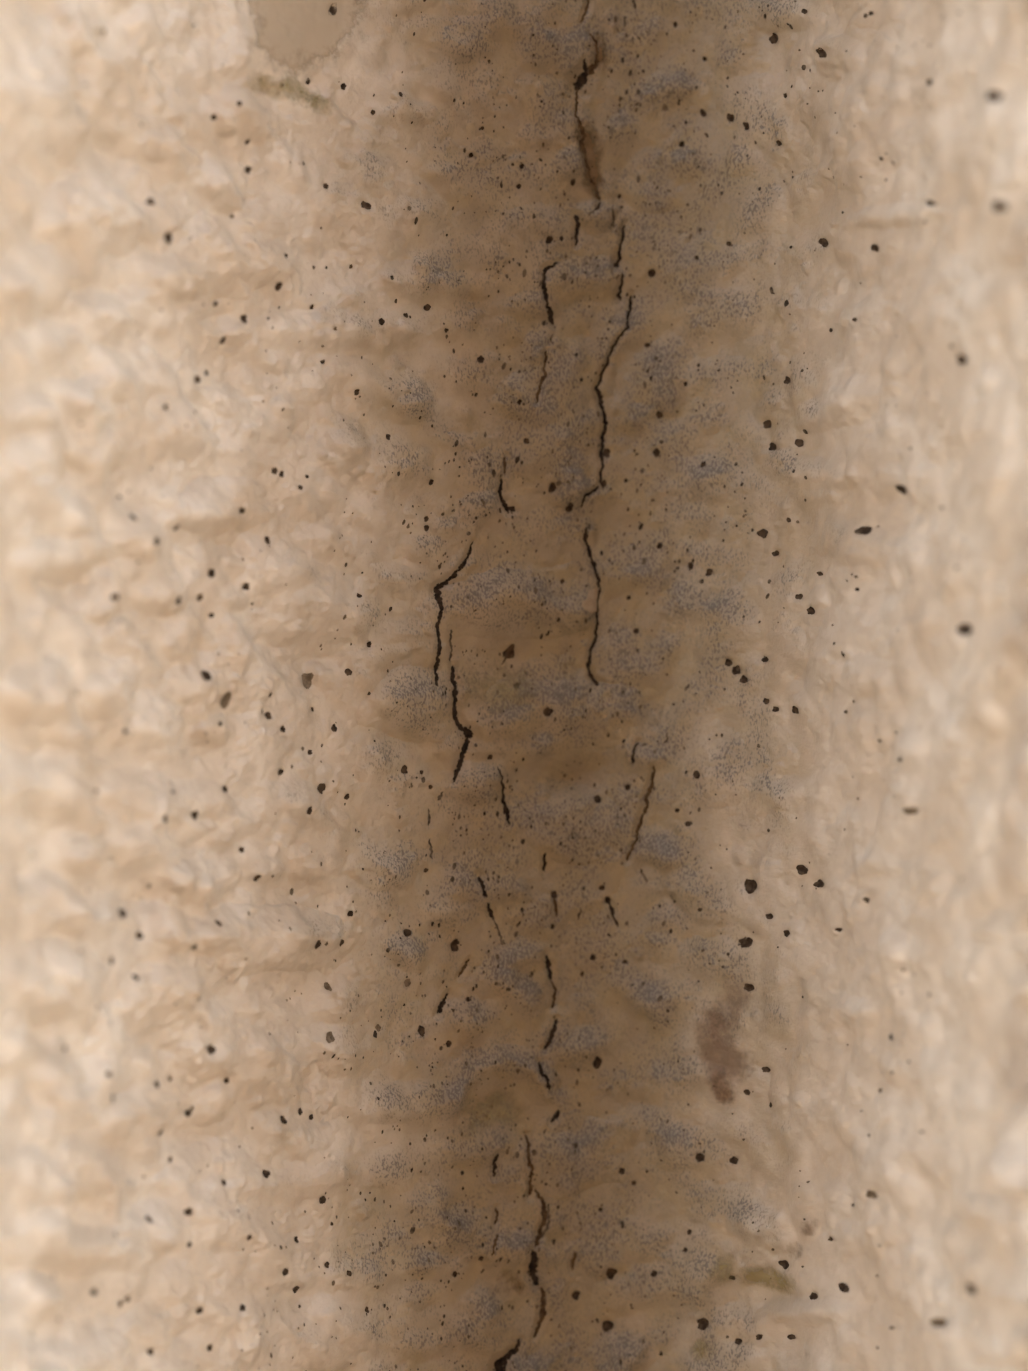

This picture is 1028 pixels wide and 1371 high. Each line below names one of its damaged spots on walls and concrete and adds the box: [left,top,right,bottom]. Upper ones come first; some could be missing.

crack [535,0,636,686]
crack [498,456,515,512]
crack [428,542,473,859]
crack [497,767,511,826]
crack [626,732,668,882]
crack [477,876,503,945]
crack [542,853,618,926]
crack [437,959,469,1013]
crack [491,955,560,1371]
crack [570,1252,578,1271]